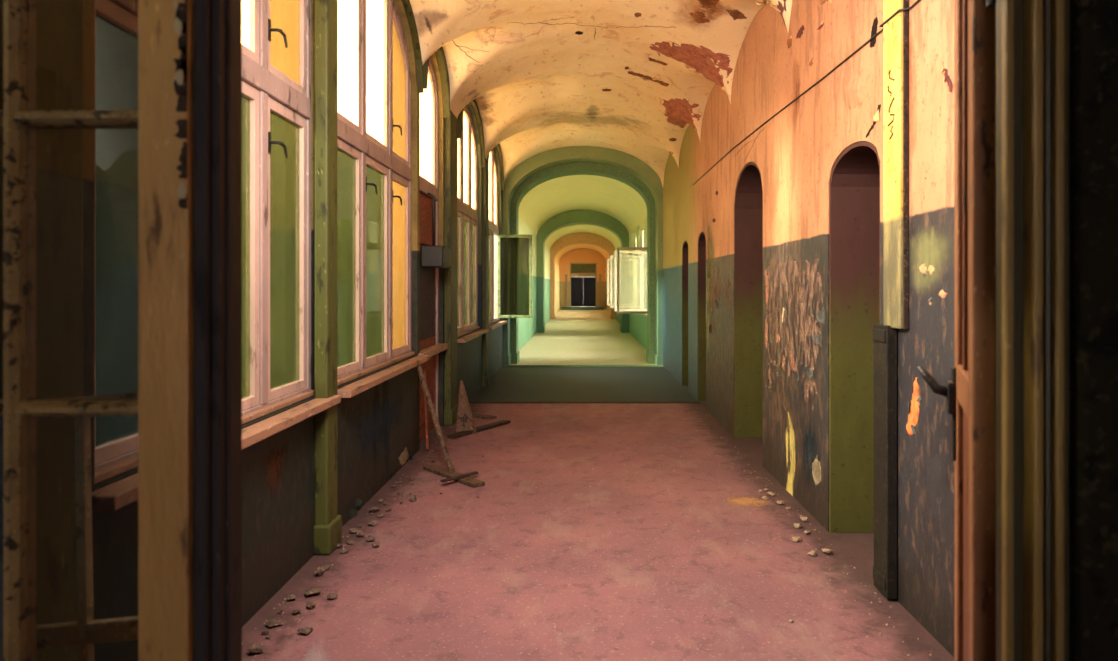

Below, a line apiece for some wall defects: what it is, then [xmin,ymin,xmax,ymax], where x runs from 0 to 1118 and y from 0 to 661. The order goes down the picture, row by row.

peeling [689,0,747,24]
spalling [754,0,824,49]
spalling [870,17,878,47]
spalling [647,41,733,91]
spalling [625,66,702,154]